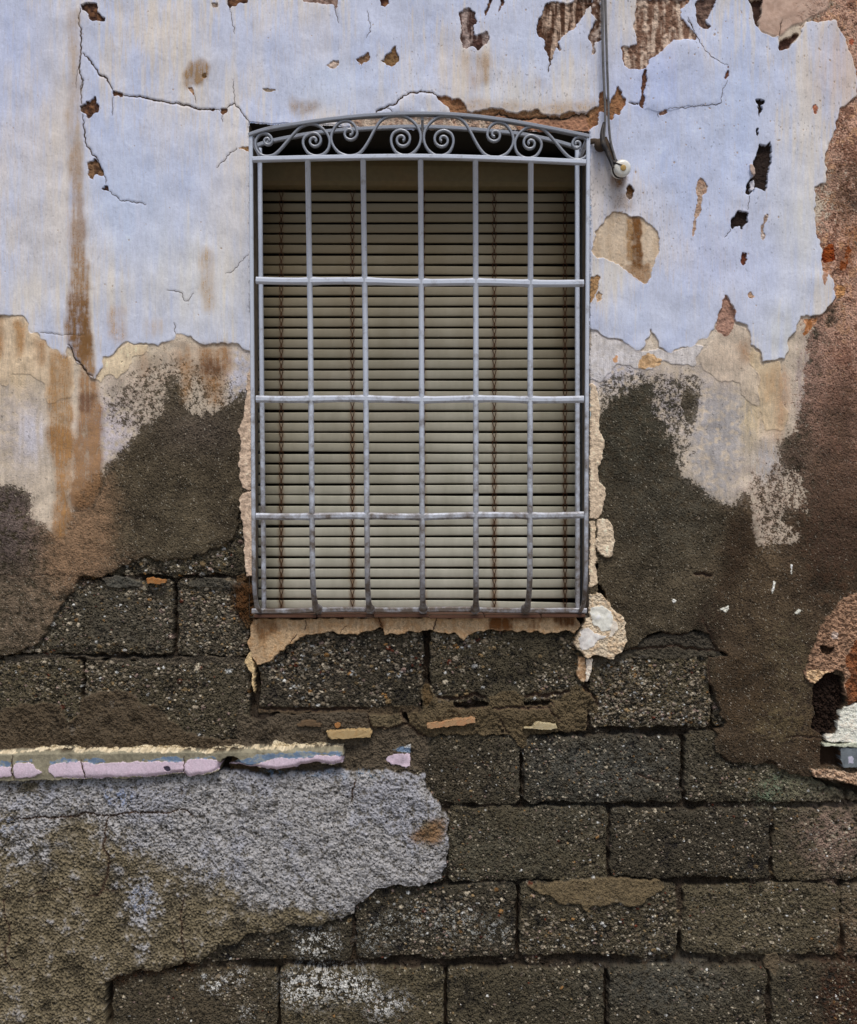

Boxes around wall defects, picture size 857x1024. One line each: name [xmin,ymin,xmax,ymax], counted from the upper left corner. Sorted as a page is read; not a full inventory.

crack [75,8,249,205]
crack [376,91,438,113]
spalling [536,0,601,62]
spalling [621,0,716,109]
crack [629,18,728,115]
flaking render [748,0,857,76]
flaking render [589,90,857,549]
leakage [40,212,108,574]
flaking render [0,315,250,539]
leakage [201,347,230,402]
flaking render [803,593,857,706]
peeling [0,740,345,779]